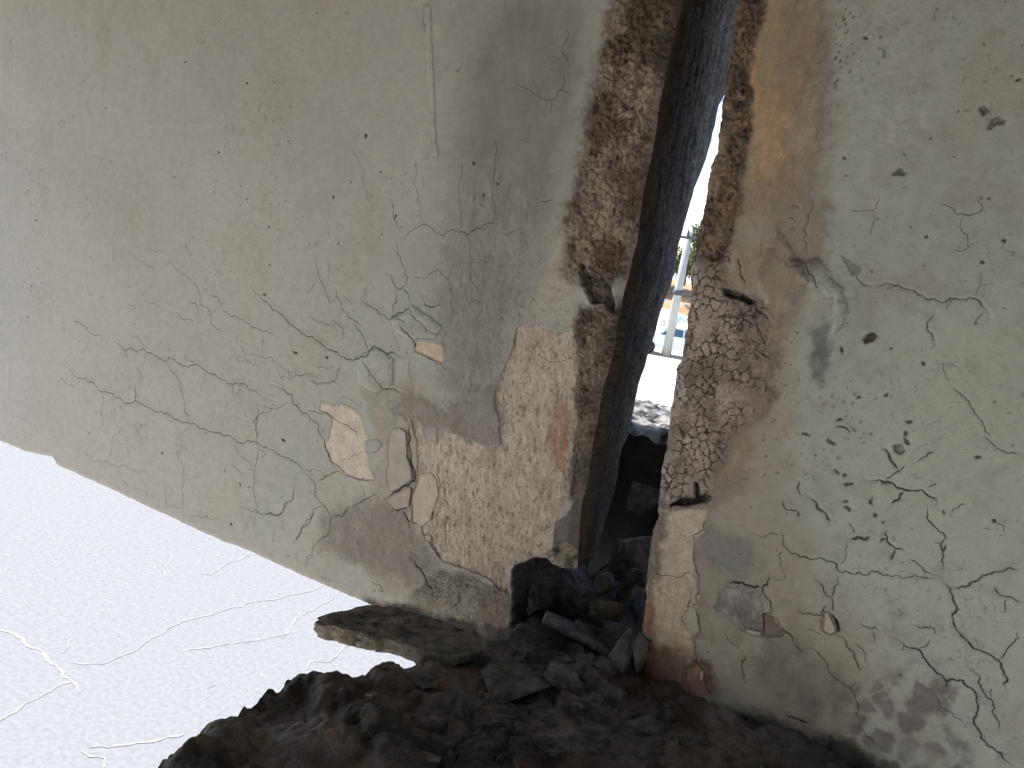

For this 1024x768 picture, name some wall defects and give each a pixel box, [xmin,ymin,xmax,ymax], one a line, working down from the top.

crack [59,139,522,628]
peeling [320,0,673,593]
spalling [640,0,775,694]
crack [754,309,770,359]
corrosion [721,0,823,281]
crack [786,200,818,288]
crack [856,274,983,341]
crack [941,203,983,252]
crack [943,364,1015,454]
crack [731,449,1019,762]